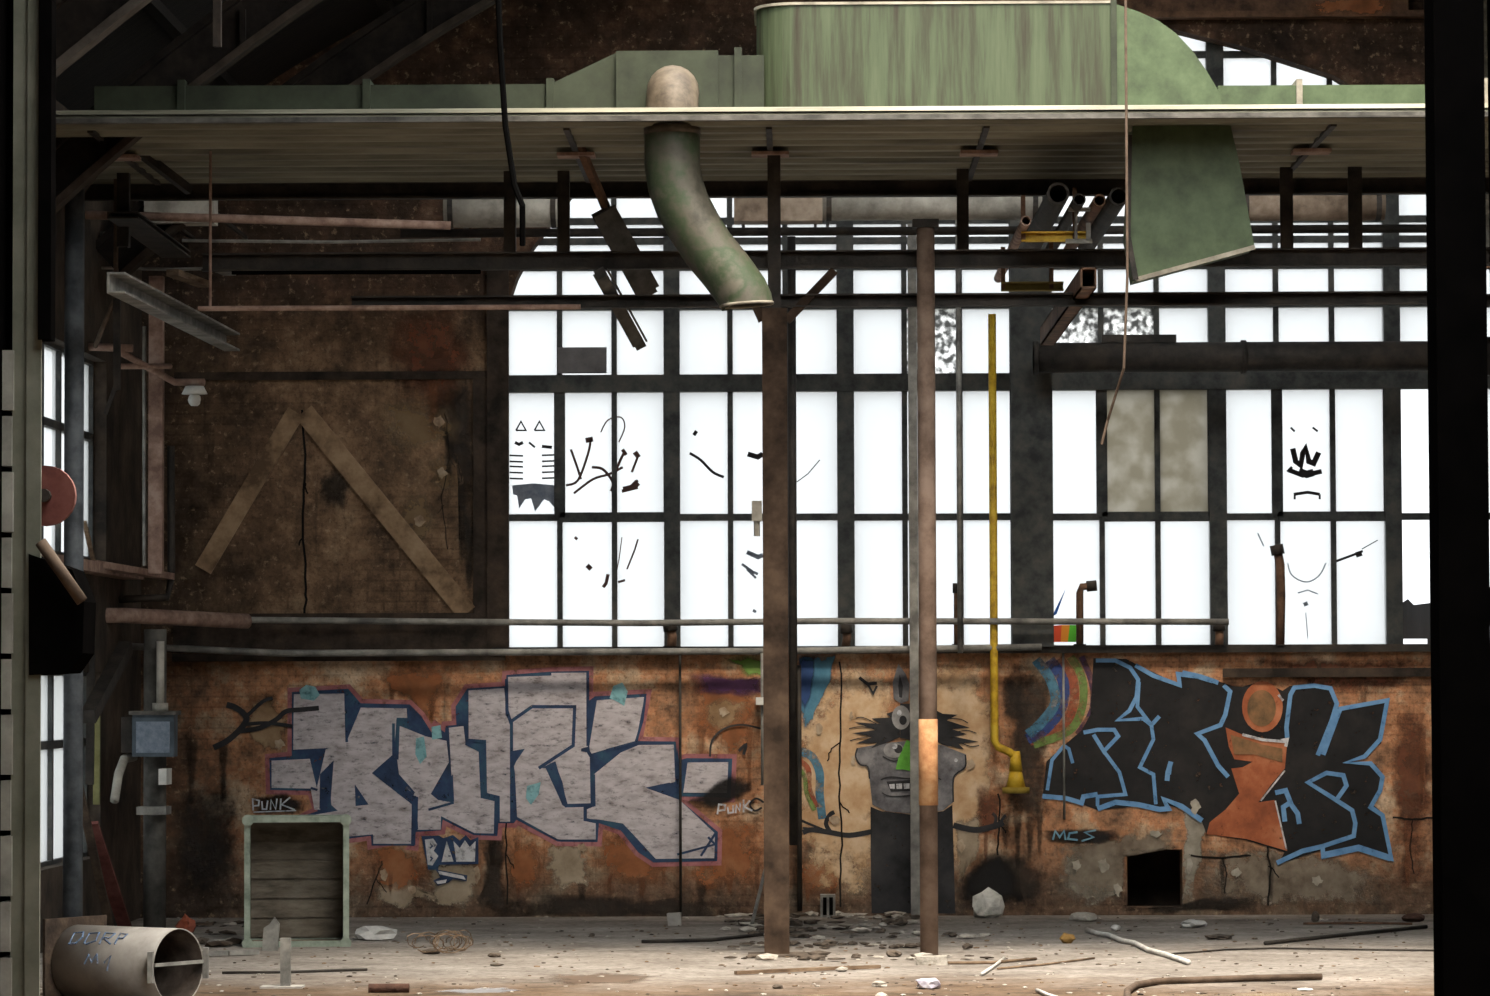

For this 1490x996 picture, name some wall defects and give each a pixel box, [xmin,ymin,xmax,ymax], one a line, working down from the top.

water stain [177,743,235,894]
peeling [379,864,481,908]
peeling [1062,799,1377,905]